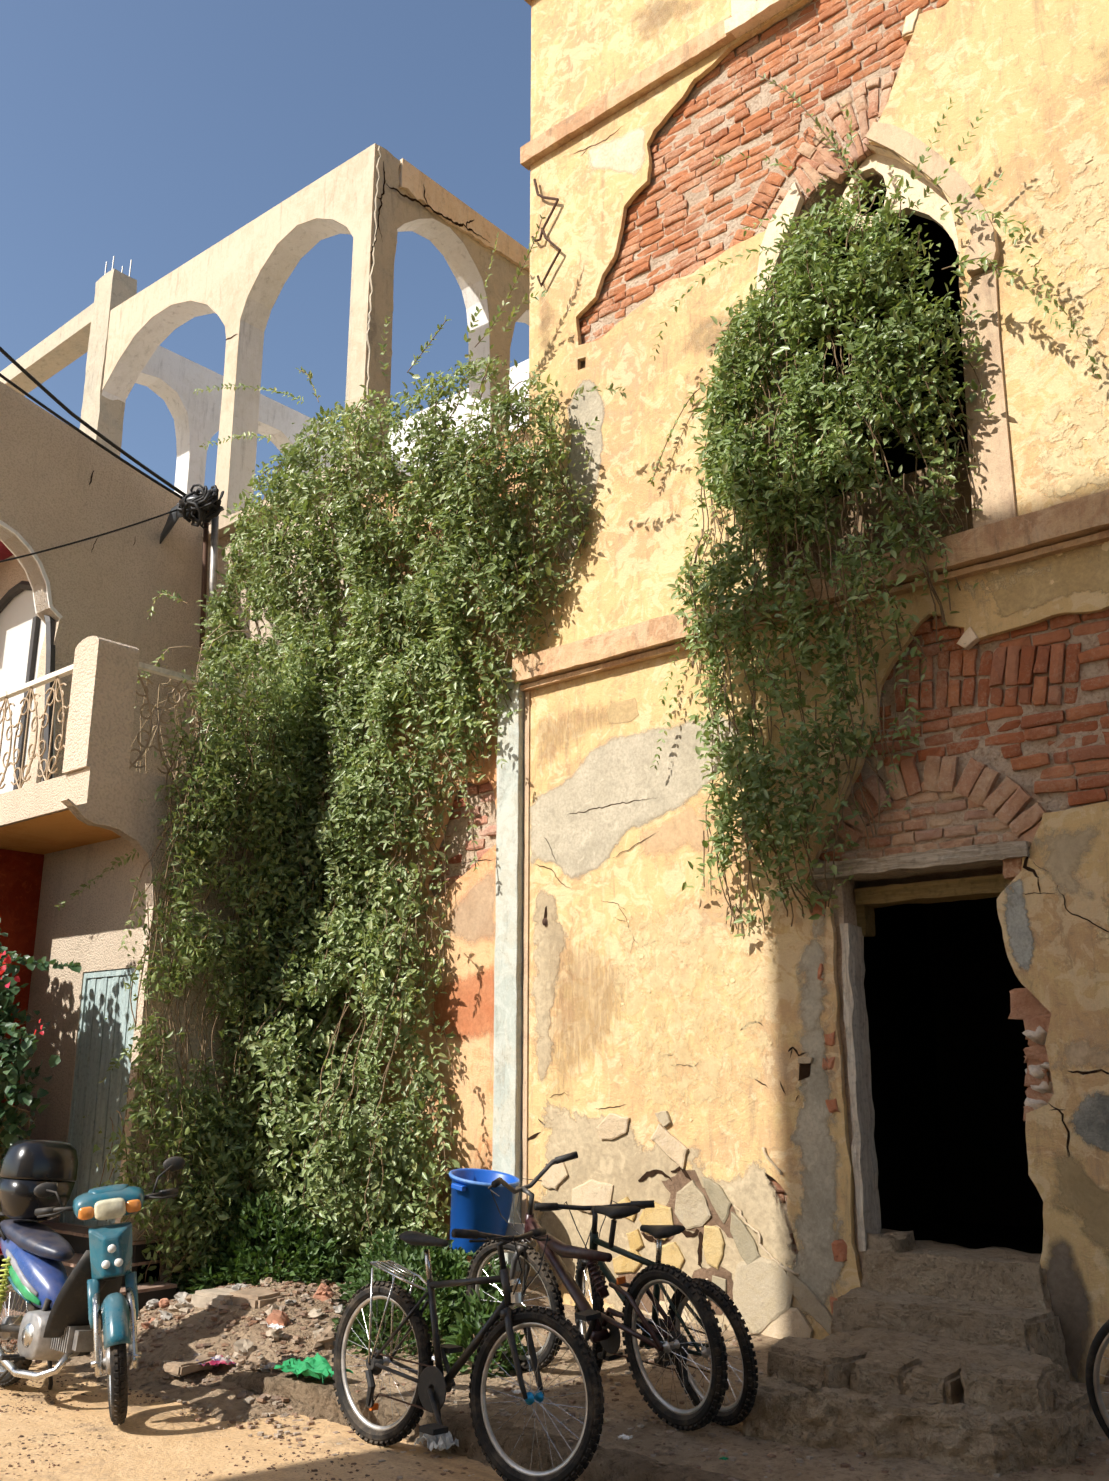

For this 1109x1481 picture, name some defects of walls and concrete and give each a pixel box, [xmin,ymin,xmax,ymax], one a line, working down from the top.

crack [370,161,490,272]
flaking render [579,0,949,345]
flaking render [819,609,1109,880]
crack [1022,854,1109,933]
flaking render [798,1031,835,1081]
spalling [1008,988,1054,1121]
crack [1068,1068,1109,1076]
crack [1049,1104,1070,1157]
flaking render [538,1102,837,1339]
flaking render [831,1239,847,1262]